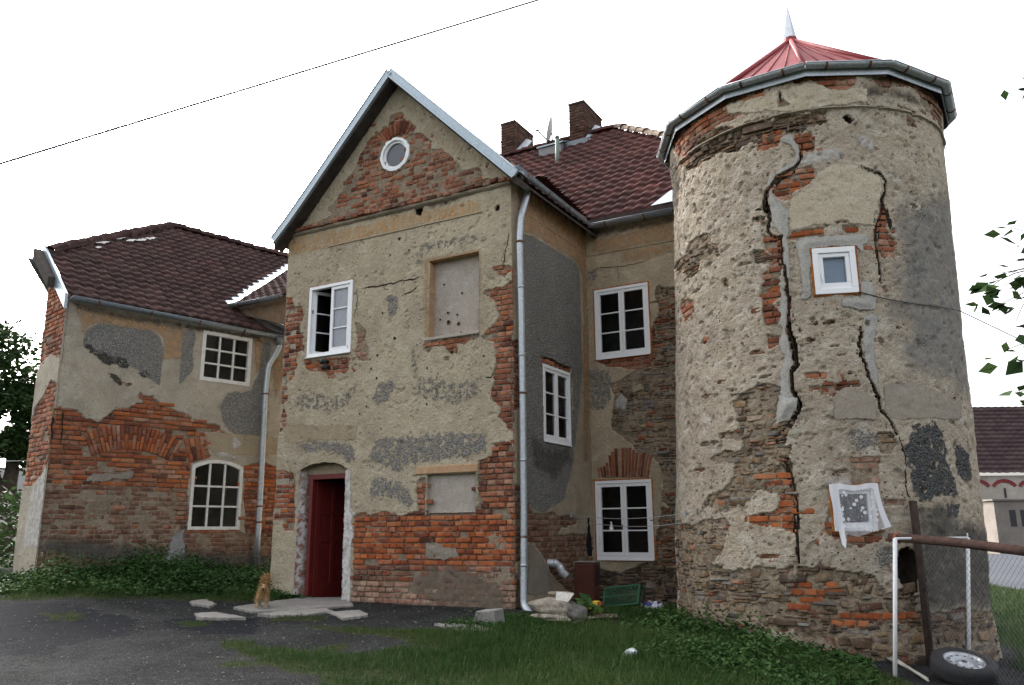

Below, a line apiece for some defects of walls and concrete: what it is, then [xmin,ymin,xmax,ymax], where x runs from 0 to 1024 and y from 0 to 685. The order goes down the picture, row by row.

flaking render [306,112,490,226]
flaking render [673,88,826,201]
flaking render [792,75,943,130]
crack [860,166,895,284]
flaking render [39,287,70,367]
flaking render [23,340,300,574]
flaking render [280,297,378,431]
crack [354,276,421,314]
flaking render [343,213,1000,665]
crack [755,143,813,428]
crack [784,457,802,567]
crack [857,327,910,498]